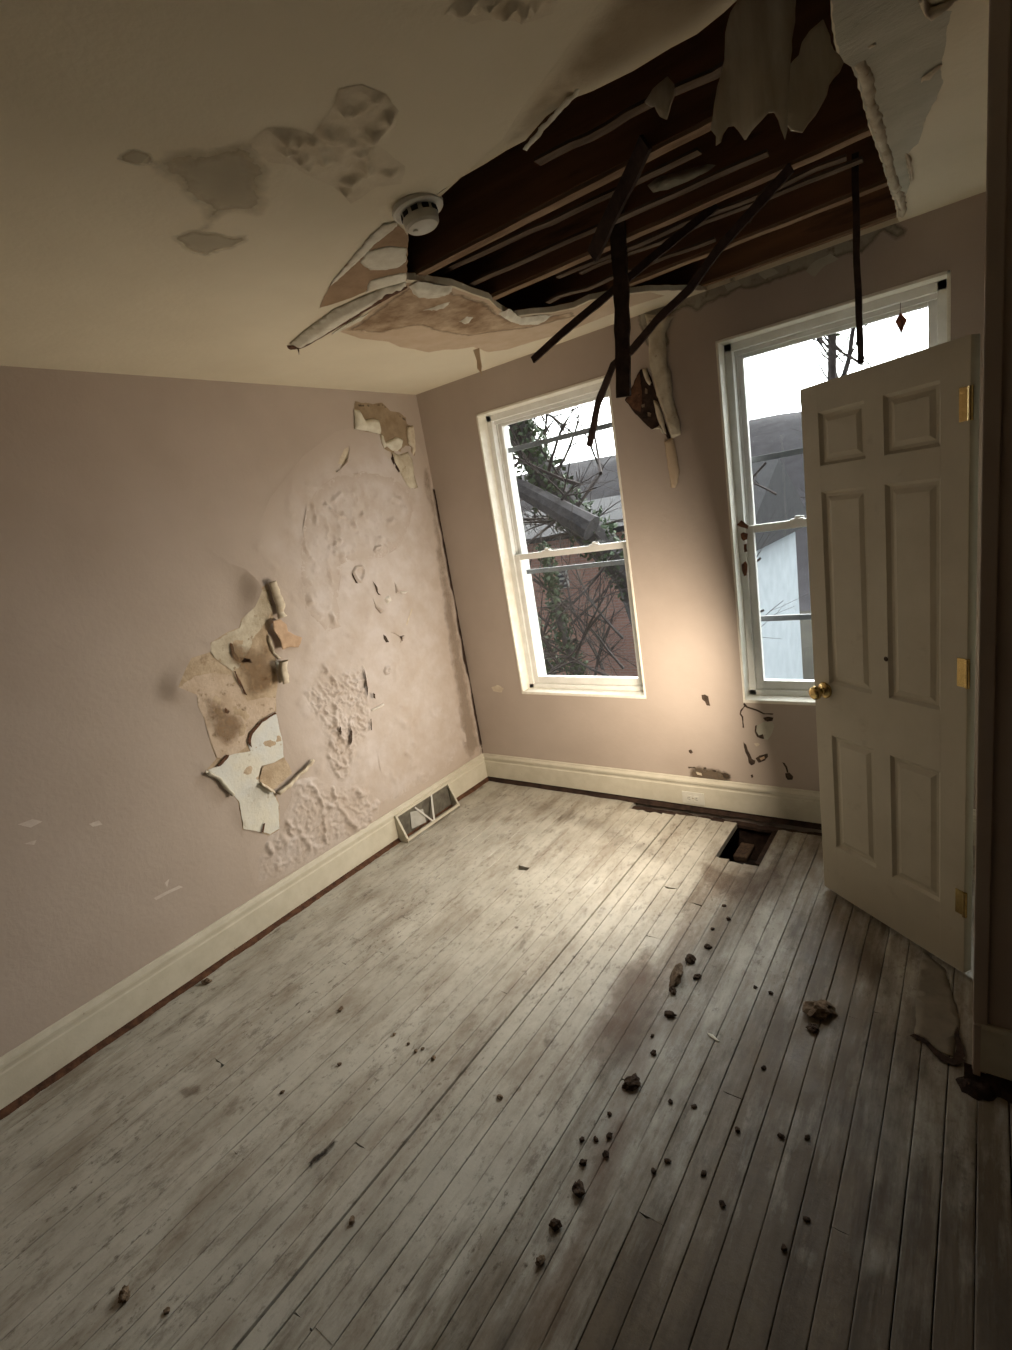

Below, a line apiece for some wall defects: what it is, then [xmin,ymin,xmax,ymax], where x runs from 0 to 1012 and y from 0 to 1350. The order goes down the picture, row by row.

spalling [854,42,913,218]
peeling [354,401,418,489]
peeling [149,541,315,838]
peeling [743,717,793,780]